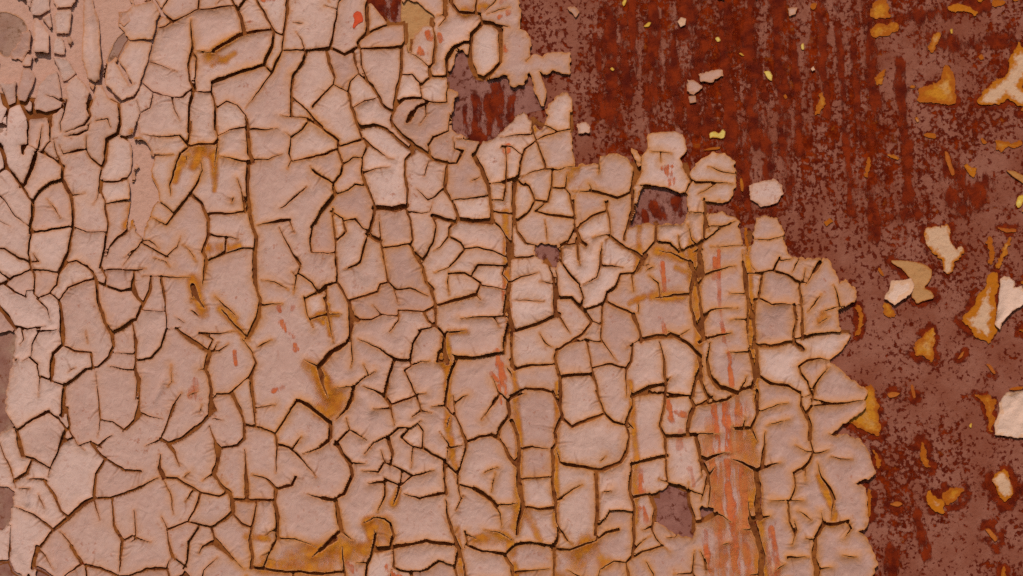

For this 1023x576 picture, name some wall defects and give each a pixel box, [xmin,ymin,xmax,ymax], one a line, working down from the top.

crack [593,338,699,423]
crack [631,131,690,205]
rust [628,165,703,383]
crack [627,394,743,576]
rust [592,0,805,219]
crack [607,151,801,404]
rust [703,351,779,576]
peeling [740,178,784,207]
rust [815,0,1016,244]
peeling [910,39,1023,119]
peeling [953,236,1023,344]
peeling [971,386,1023,438]